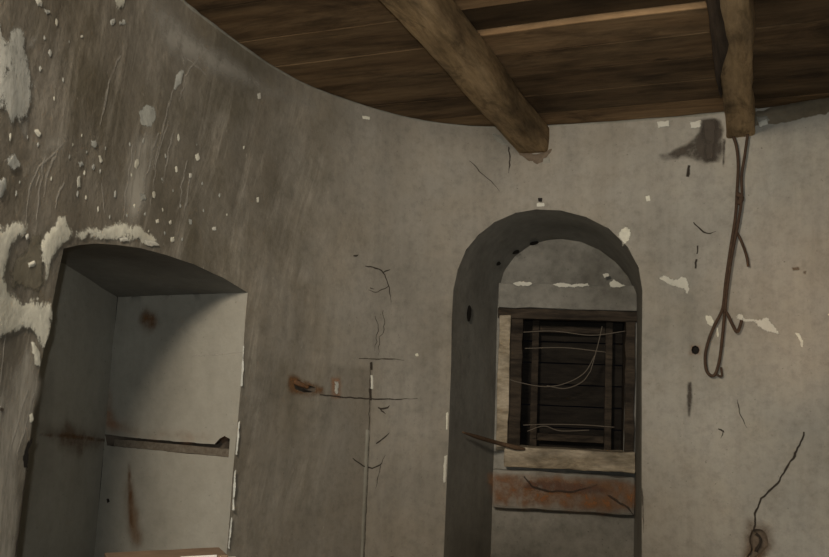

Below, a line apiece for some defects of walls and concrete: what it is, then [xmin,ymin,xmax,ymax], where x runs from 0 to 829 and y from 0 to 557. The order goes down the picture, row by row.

peeling [110,0,126,26]
peeling [0,28,46,139]
peeling [8,154,21,170]
water stain [702,119,725,164]
peeling [0,177,21,198]
peeling [28,105,183,280]
peeling [659,275,689,294]
peeling [736,314,779,334]
peeling [0,222,53,557]
crack [753,432,805,532]